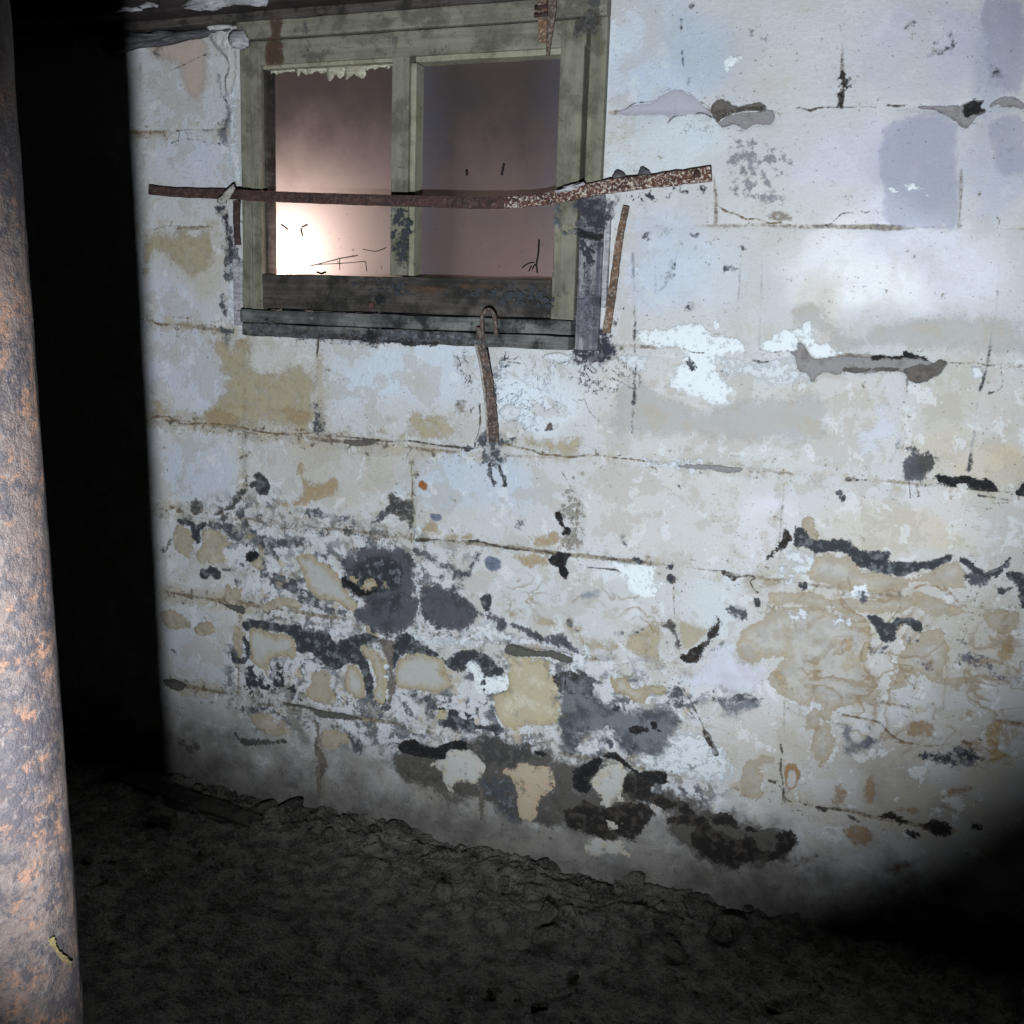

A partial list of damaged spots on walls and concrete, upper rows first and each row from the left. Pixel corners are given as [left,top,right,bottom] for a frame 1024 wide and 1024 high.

corrosion [148,166,712,209]
spalling [618,90,793,221]
spalling [918,96,1024,128]
corrosion [602,206,629,334]
peeling [637,316,947,406]
crack [151,415,313,436]
crack [348,394,647,479]
water stain [177,462,1024,871]